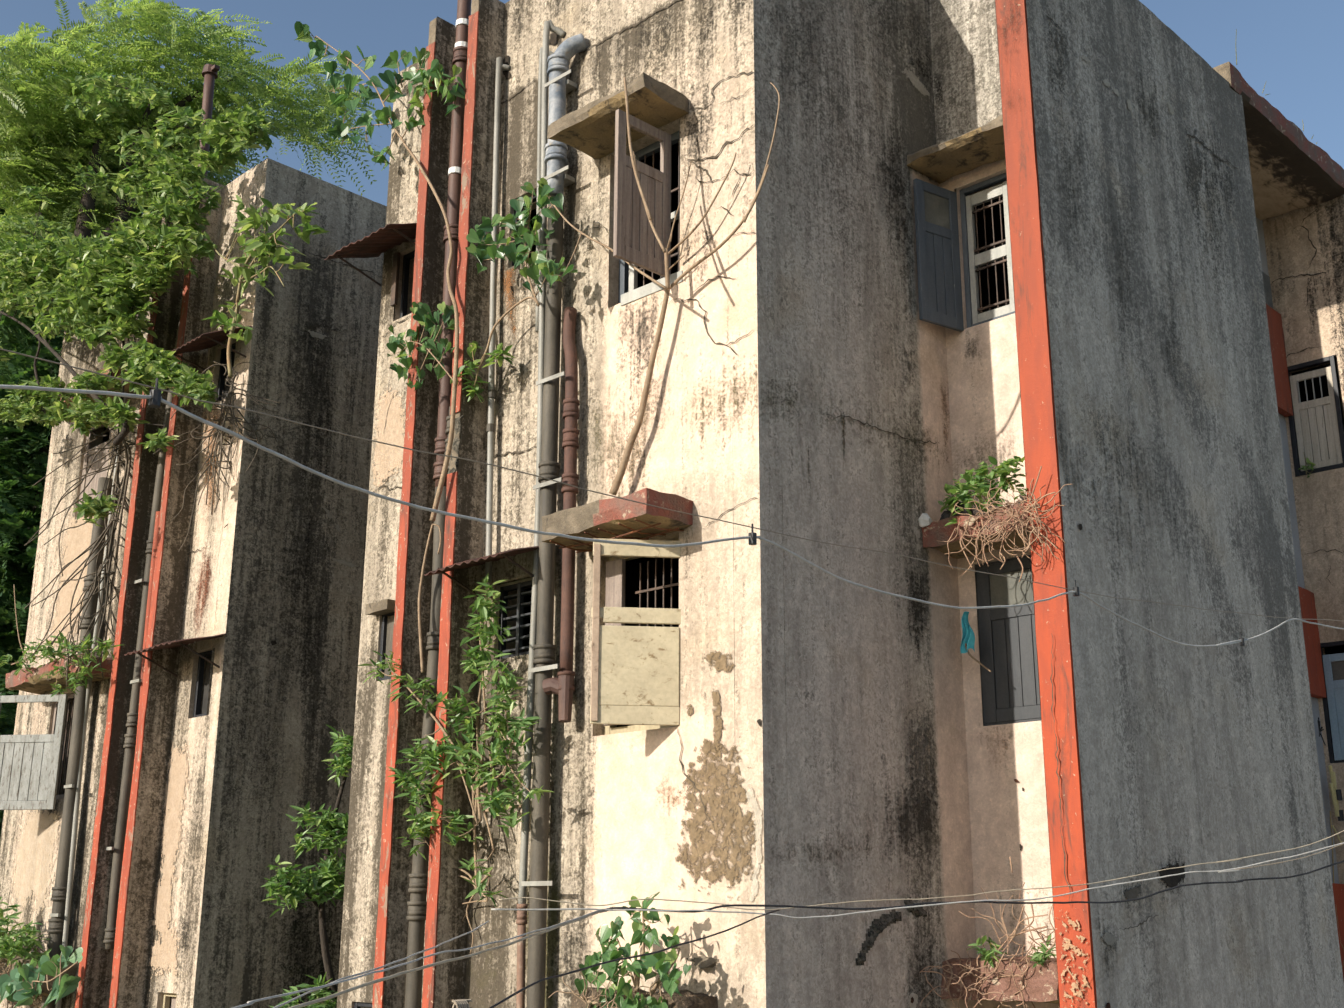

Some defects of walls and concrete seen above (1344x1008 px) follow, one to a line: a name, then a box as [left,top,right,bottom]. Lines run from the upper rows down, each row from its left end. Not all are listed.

damp [680,102,712,165]
crack [687,71,755,235]
crack [670,276,750,355]
damp [907,572,929,651]
damp [885,716,939,857]
peeling [1055,909,1090,1008]